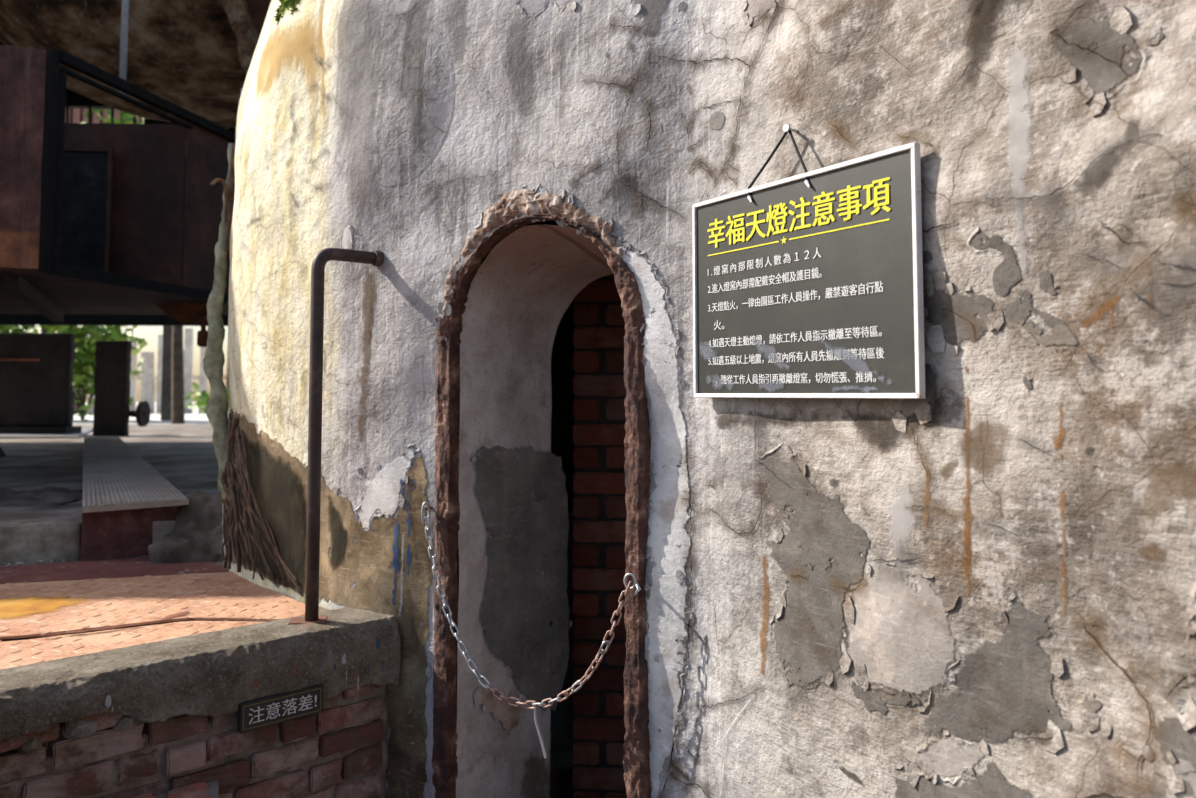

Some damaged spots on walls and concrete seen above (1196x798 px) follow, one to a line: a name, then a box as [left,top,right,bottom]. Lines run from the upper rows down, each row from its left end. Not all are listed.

crack [572,5,778,218]
crack [824,118,854,149]
damp [969,0,1000,81]
crack [1051,0,1130,77]
damp [226,434,306,595]
peeling [222,407,432,798]
damp [329,498,347,567]
peeling [435,183,696,798]
corrosion [759,555,769,674]
peeling [757,443,1112,798]
corrosion [925,397,1006,595]
corrosion [1053,404,1065,459]